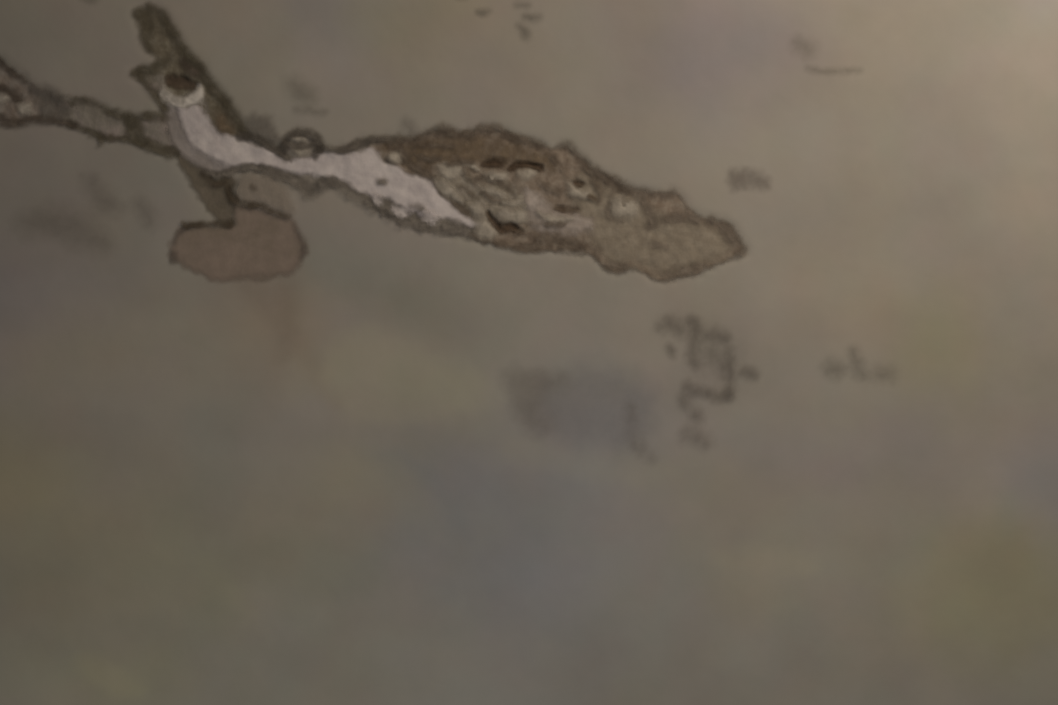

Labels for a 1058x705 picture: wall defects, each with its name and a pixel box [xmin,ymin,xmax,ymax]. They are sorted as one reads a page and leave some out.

spalling [0,59,76,127]
spalling [132,5,746,281]